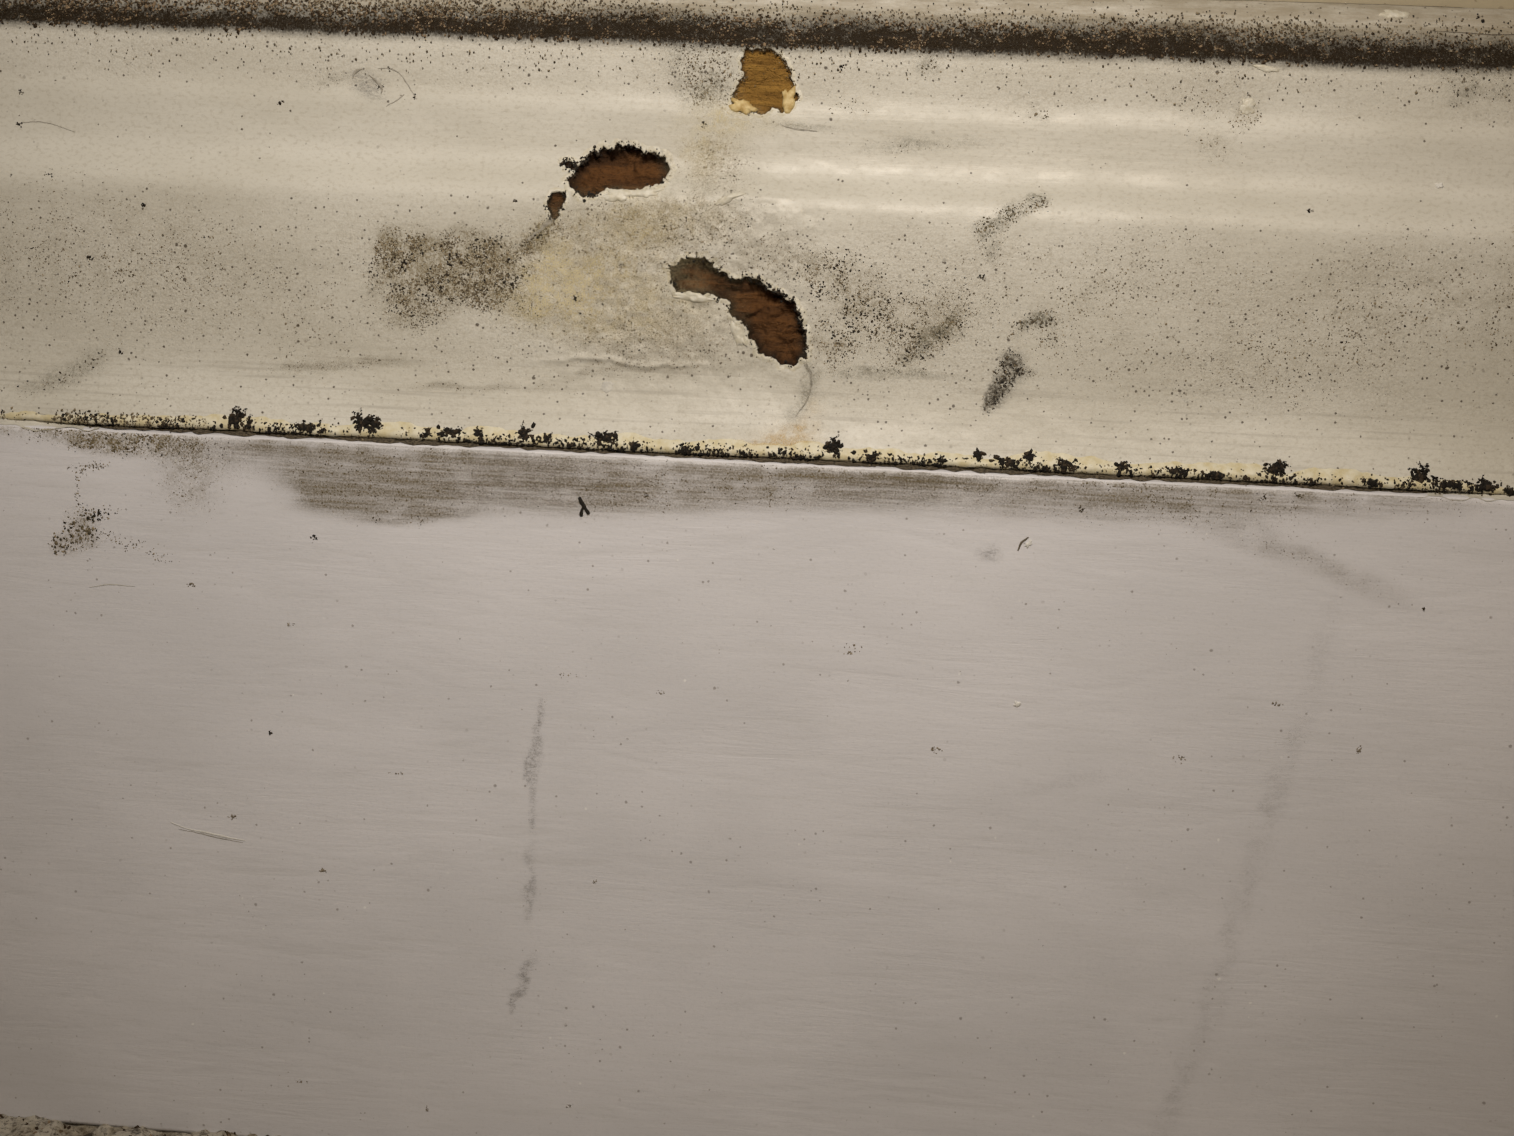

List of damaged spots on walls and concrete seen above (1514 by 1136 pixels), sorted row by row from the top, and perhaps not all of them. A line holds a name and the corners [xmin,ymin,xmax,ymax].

peeling [728,45,803,118]
spalling [547,143,670,220]
leakage [0,39,1514,420]
spalling [669,257,809,366]
leakage [0,427,1477,579]